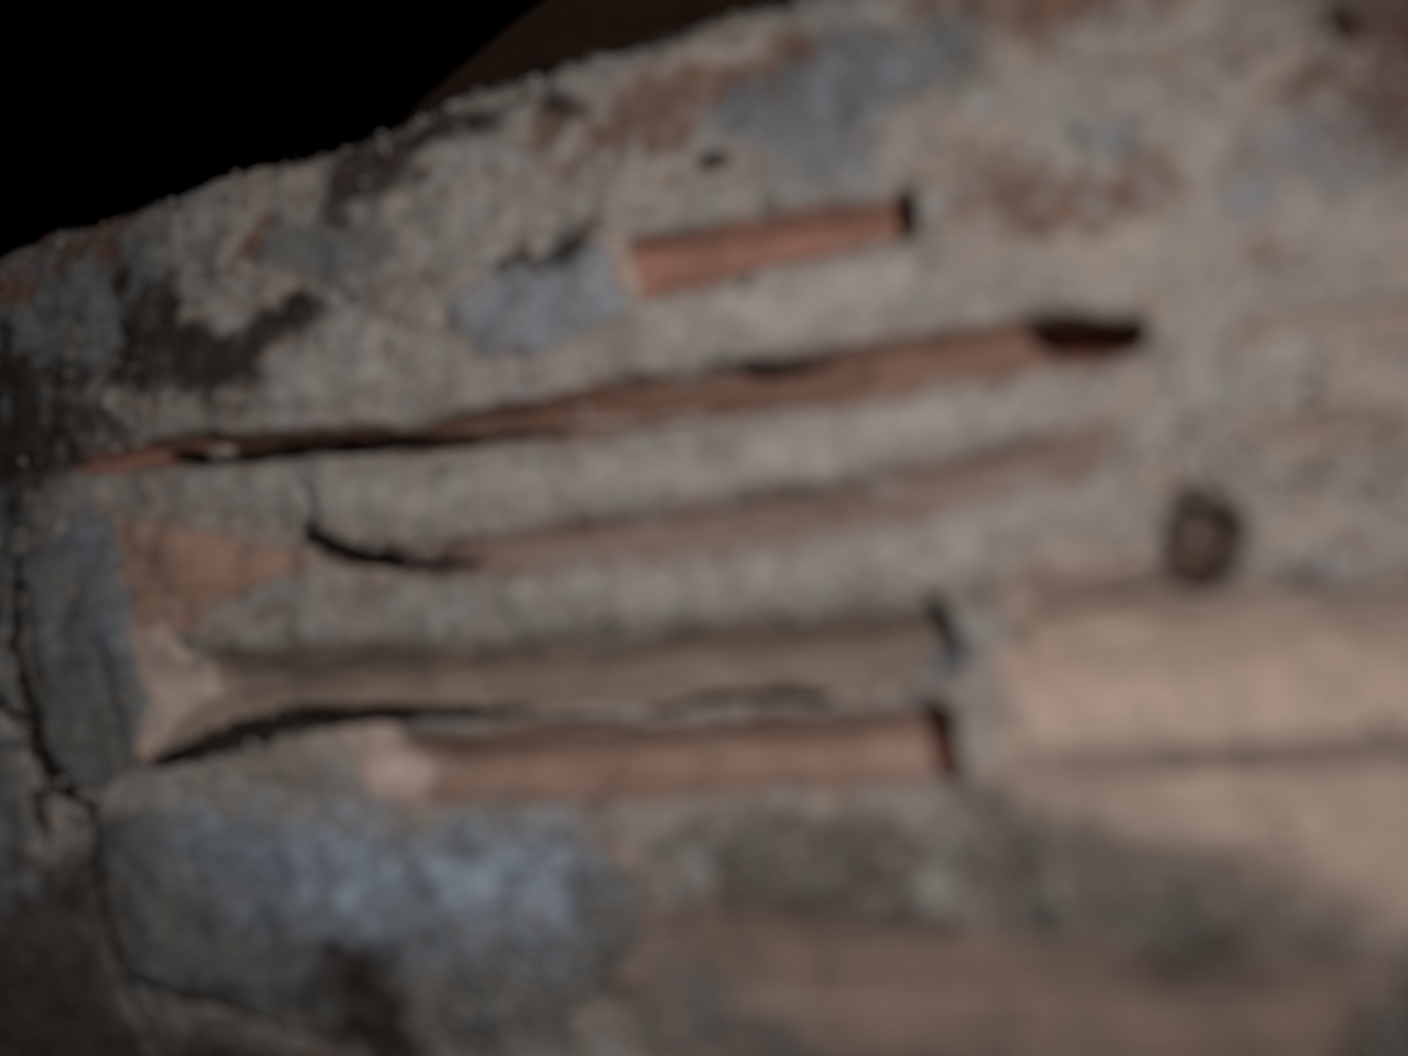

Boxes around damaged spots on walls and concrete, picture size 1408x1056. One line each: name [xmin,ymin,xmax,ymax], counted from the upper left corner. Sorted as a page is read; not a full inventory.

spalling [63,298,1149,478]
spalling [614,197,920,310]
crack [0,554,99,847]
crack [140,699,534,770]
spalling [119,423,1112,823]
spalling [995,551,1408,931]